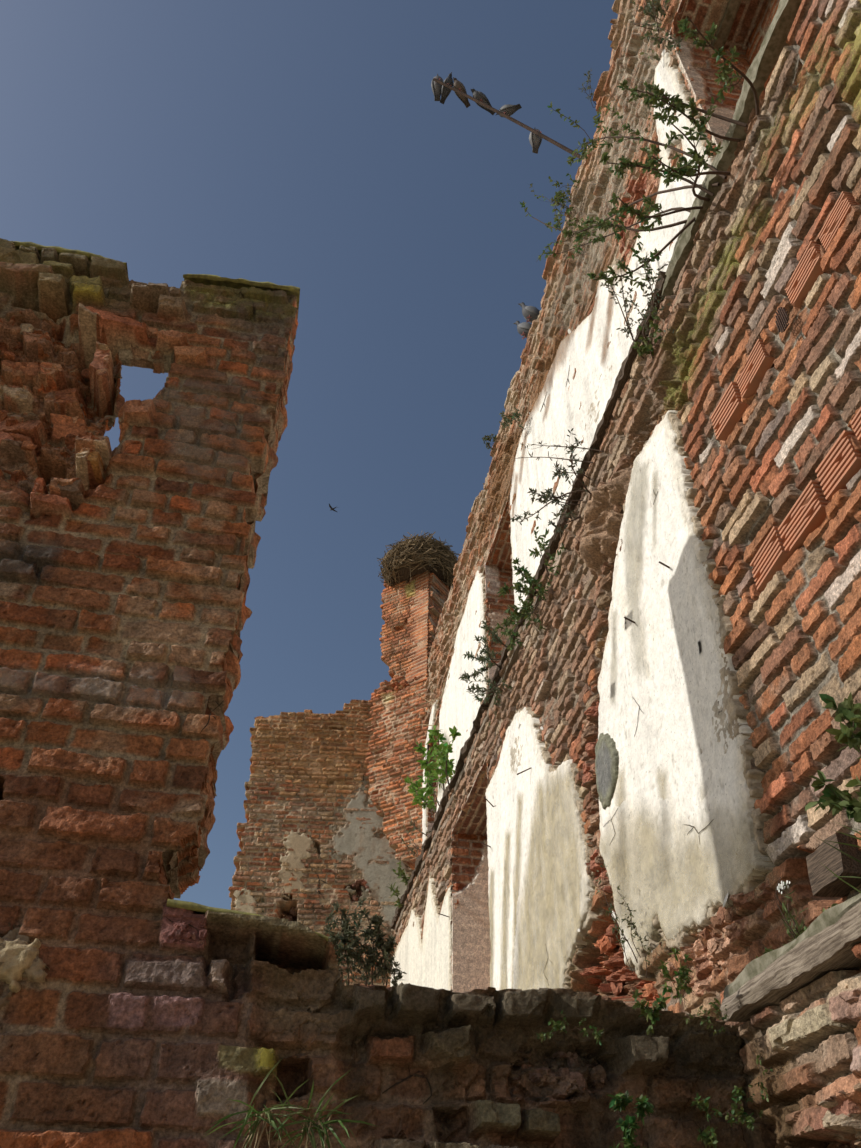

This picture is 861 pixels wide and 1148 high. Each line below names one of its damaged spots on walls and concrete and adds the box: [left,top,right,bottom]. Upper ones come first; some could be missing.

spalling [0,303,122,496]
peeling [0,937,50,993]
peeling [276,774,460,991]